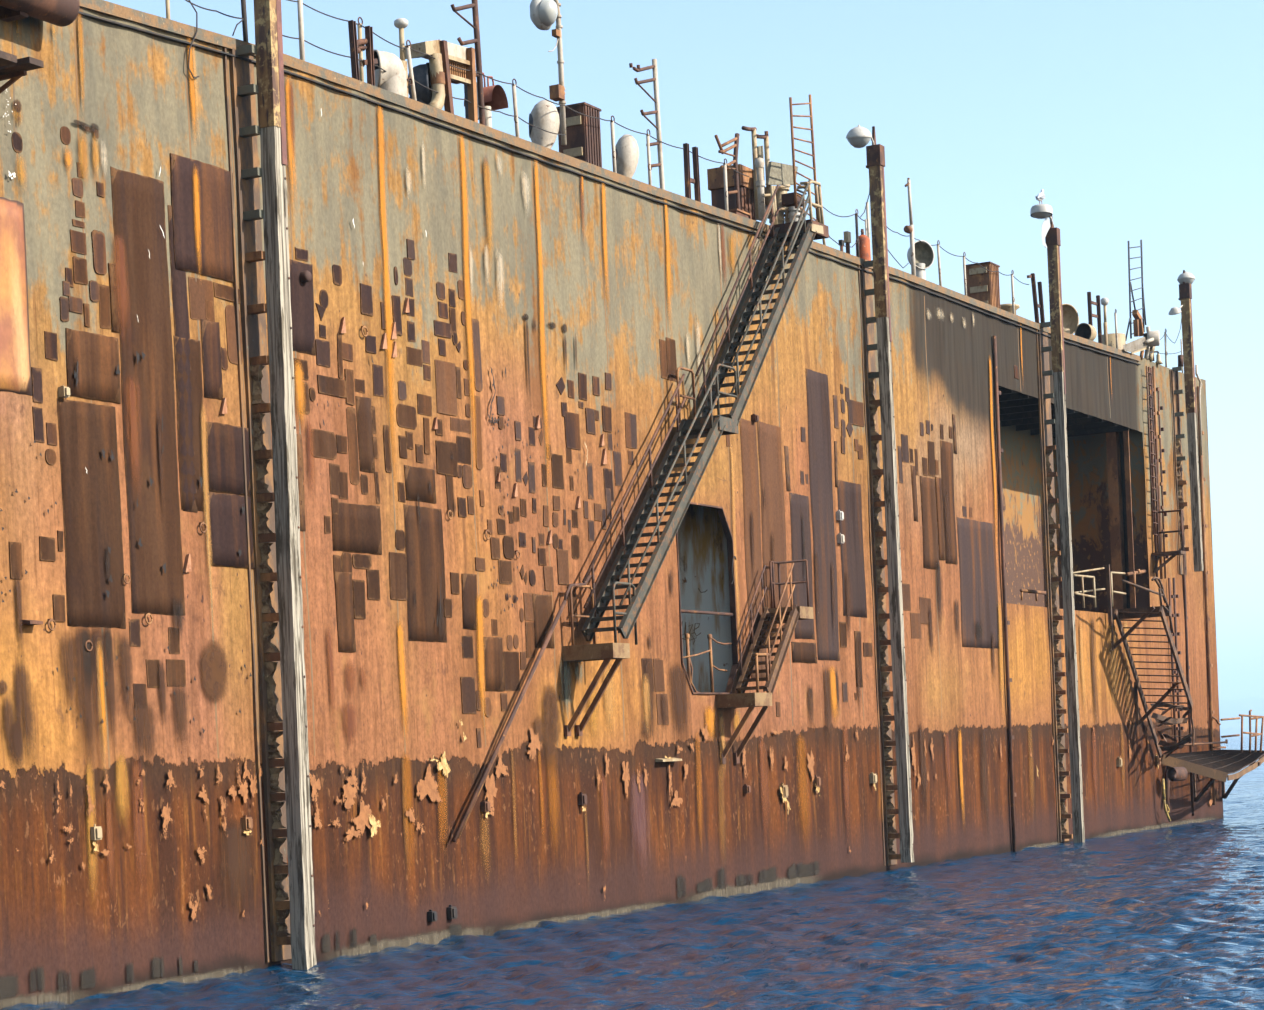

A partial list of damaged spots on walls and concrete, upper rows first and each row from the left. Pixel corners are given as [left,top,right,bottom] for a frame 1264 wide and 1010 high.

rust [378,106,394,440]
rust [398,623,407,724]
rust [87,757,145,880]
leakage [0,629,292,1004]
peeling [161,769,177,839]
peeling [198,758,263,837]
peeling [309,761,398,843]
peeling [401,751,451,836]
rust [696,708,740,826]
rust [825,667,849,821]
rust [945,731,964,812]
peeling [189,884,213,921]